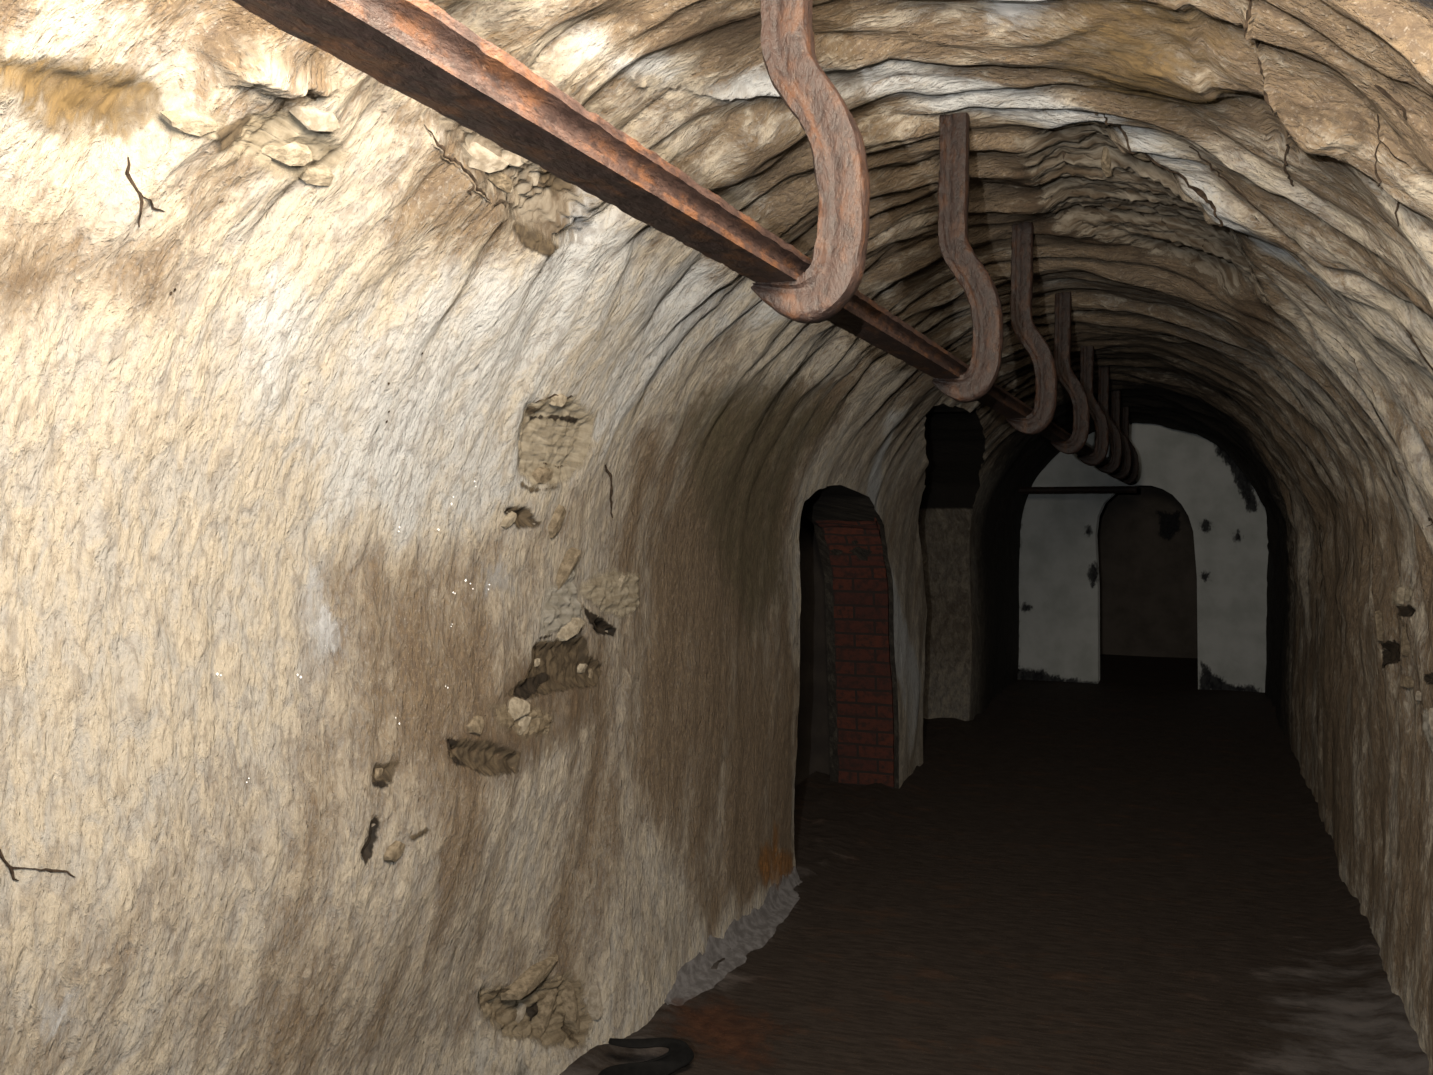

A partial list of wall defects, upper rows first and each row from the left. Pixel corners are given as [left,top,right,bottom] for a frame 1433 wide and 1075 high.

crack [1244,0,1303,186]
crack [125,156,165,228]
crack [1089,113,1275,238]
crack [1363,84,1417,227]
crack [1321,329,1381,410]
crack [1406,329,1433,371]
spalling [500,394,595,538]
water stain [319,606,335,651]
spalling [447,547,640,776]
crack [0,849,76,881]
spalling [478,954,602,1049]